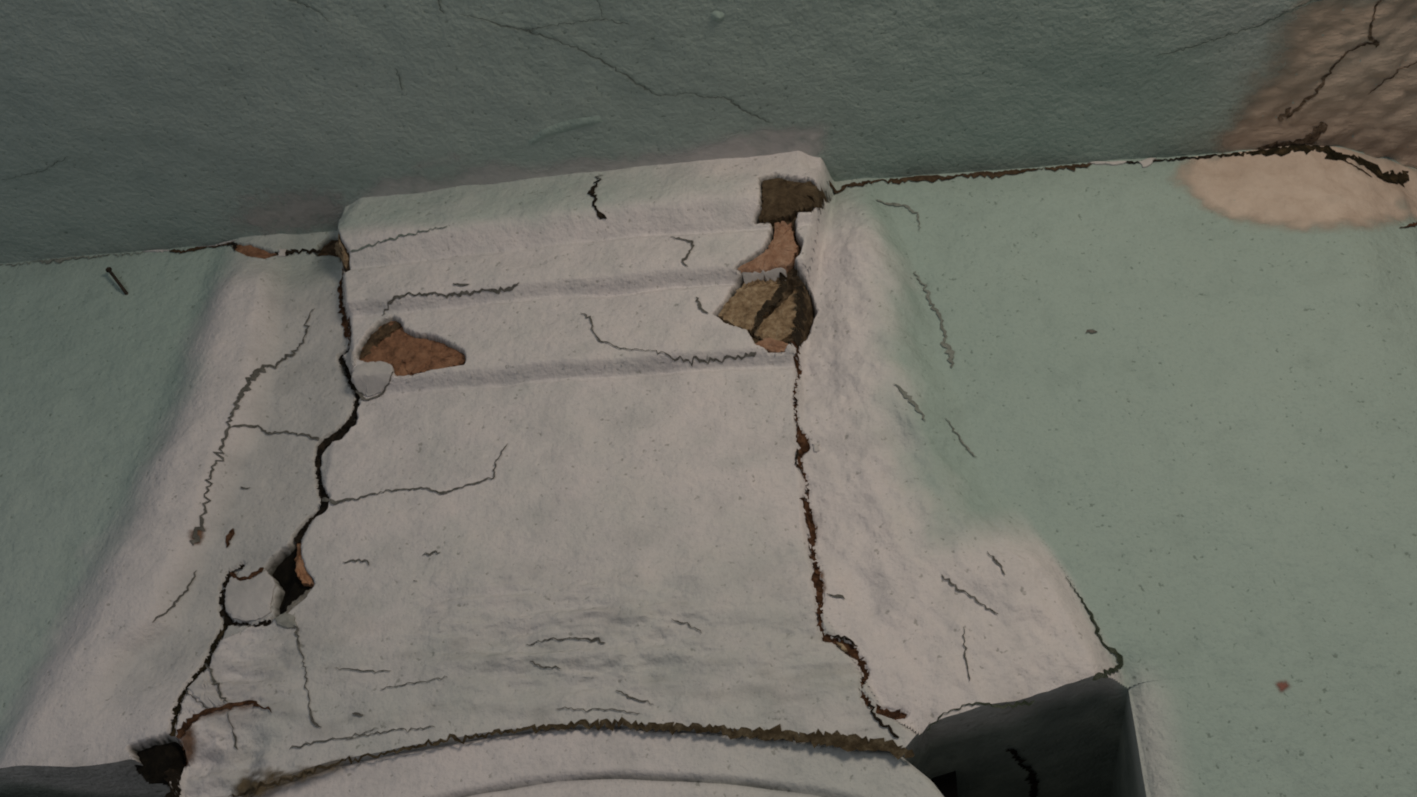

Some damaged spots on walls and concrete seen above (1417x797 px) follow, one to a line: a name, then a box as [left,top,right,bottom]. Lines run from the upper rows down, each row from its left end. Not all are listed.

crack [829,0,1417,230]
crack [0,242,230,266]
spalling [719,178,827,353]
spalling [359,321,466,376]
crack [153,226,1034,797]
spalling [272,542,314,629]
crack [1065,576,1123,681]
spalling [134,742,188,786]